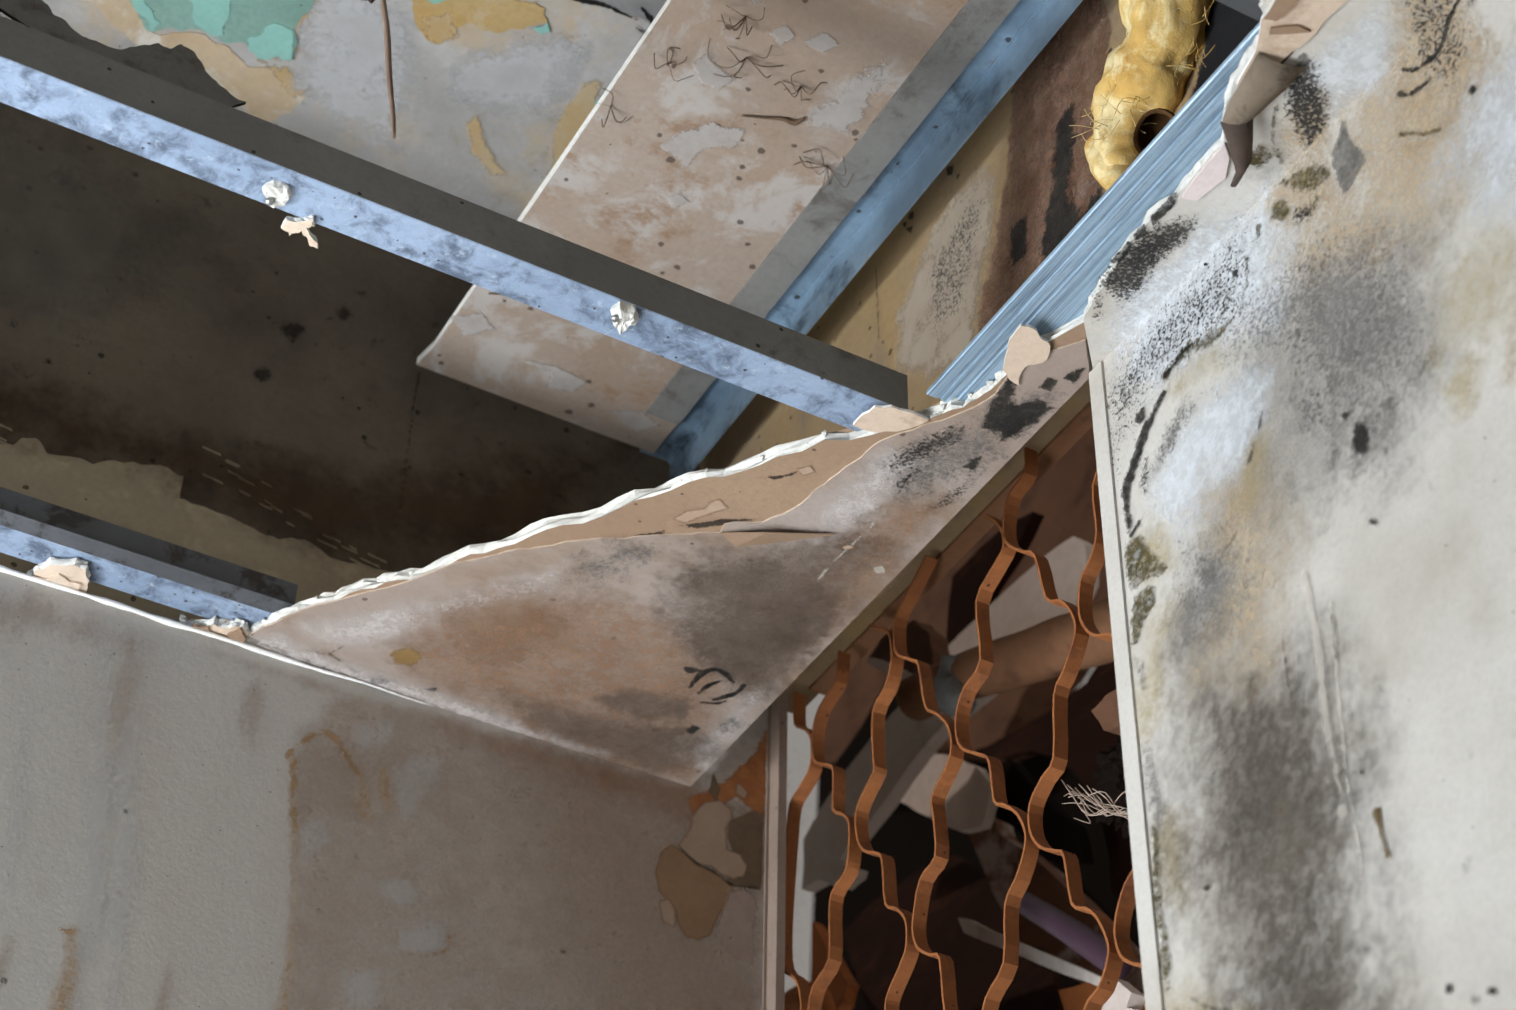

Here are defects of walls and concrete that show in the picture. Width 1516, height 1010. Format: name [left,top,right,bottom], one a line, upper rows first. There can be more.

peeling [86,0,319,122]
peeling [412,0,550,45]
crack [573,0,654,41]
peeling [547,80,603,175]
water stain [1092,0,1488,645]
peeling [0,424,392,604]
peeling [85,581,207,622]
peeling [244,633,291,655]
water stain [1144,411,1345,1010]
water stain [285,729,393,843]
peeling [655,799,764,964]
water stain [1372,808,1390,859]